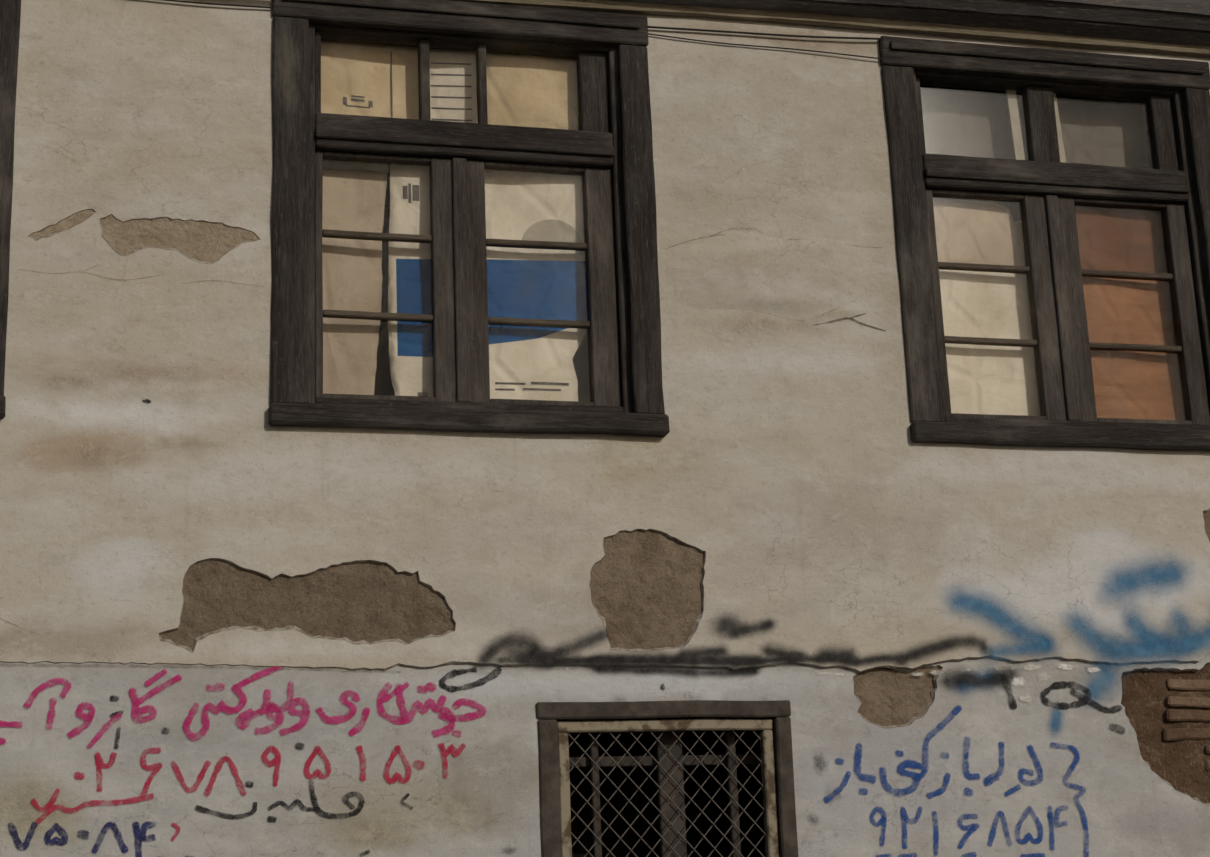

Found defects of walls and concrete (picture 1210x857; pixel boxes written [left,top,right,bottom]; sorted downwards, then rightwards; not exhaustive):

peeling [28,209,260,264]
crack [827,313,885,331]
spalling [159,558,456,653]
spalling [589,529,706,652]
spalling [815,665,944,728]
peeling [962,664,1099,702]
spalling [1121,662,1210,805]